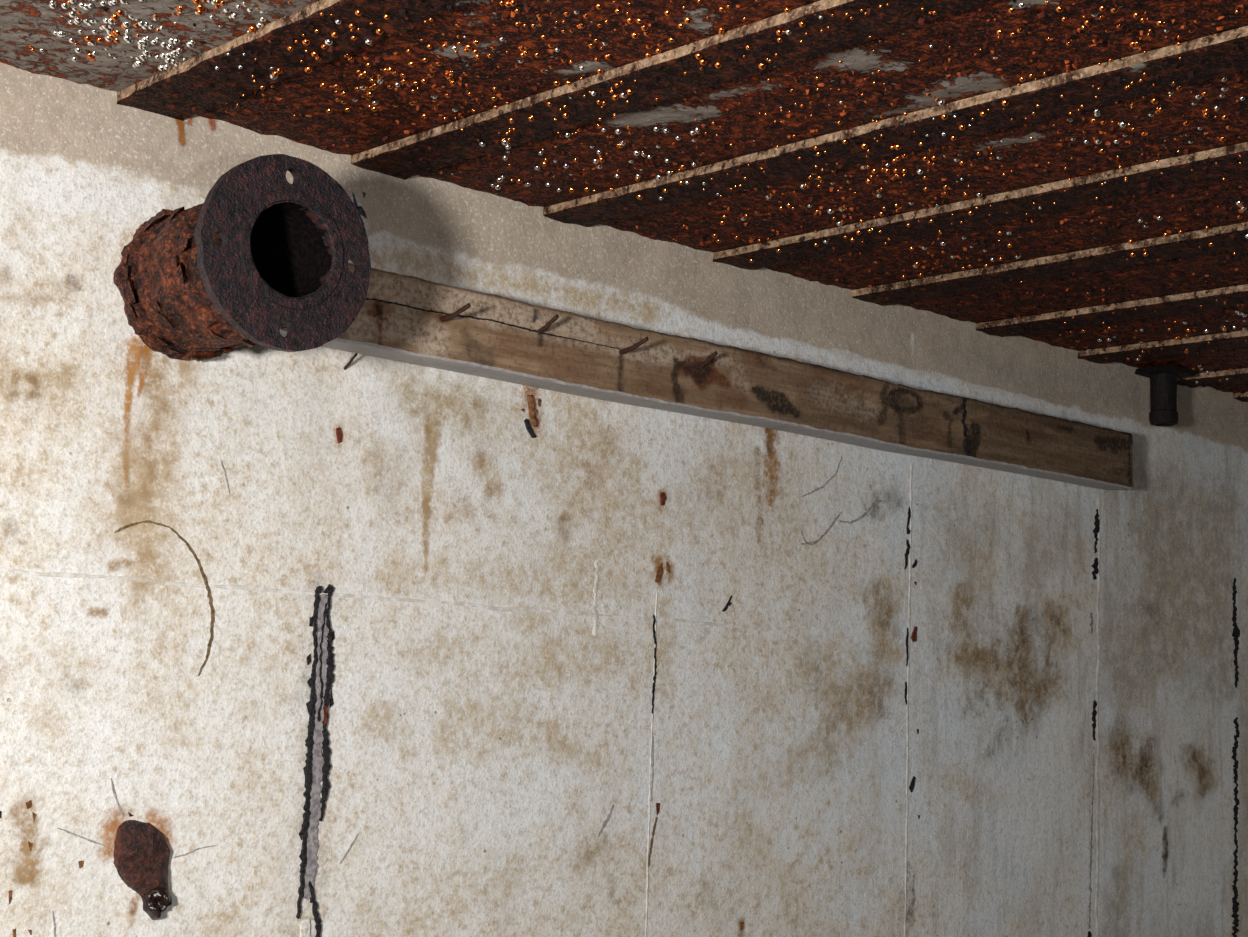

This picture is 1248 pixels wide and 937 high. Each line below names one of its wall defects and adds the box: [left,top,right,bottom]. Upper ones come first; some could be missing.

rust [176,116,192,145]
rust [120,338,190,529]
rust [757,428,780,505]
crack [1091,509,1100,580]
crack [904,626,919,734]
crack [296,584,335,937]
crack [909,776,920,818]
crack [1087,700,1097,937]
crack [1231,578,1240,937]